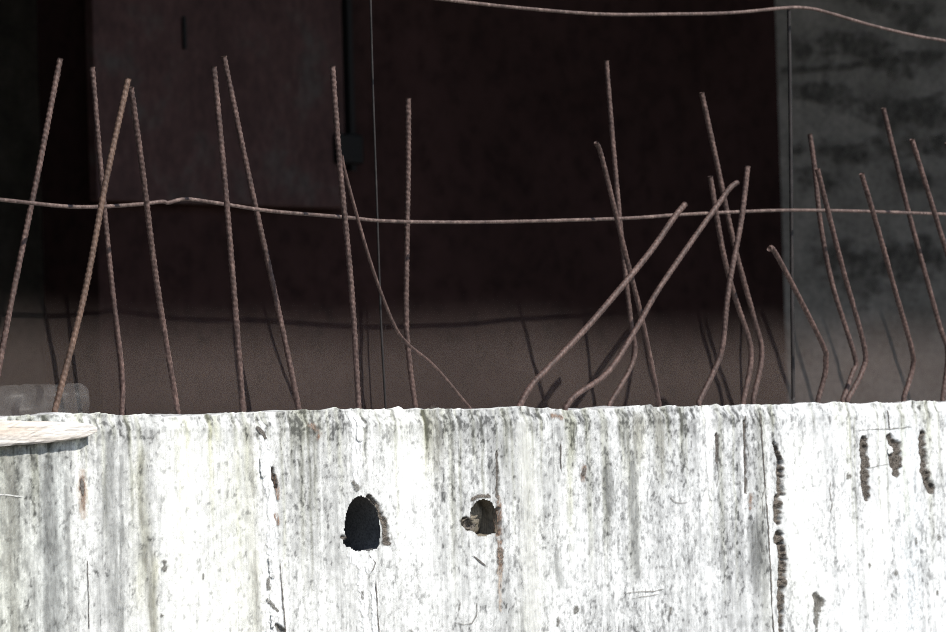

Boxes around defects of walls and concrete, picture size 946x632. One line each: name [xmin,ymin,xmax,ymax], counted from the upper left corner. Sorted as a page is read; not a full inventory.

spalling [366,494,391,545]
spalling [461,517,475,530]
rust [494,450,504,611]